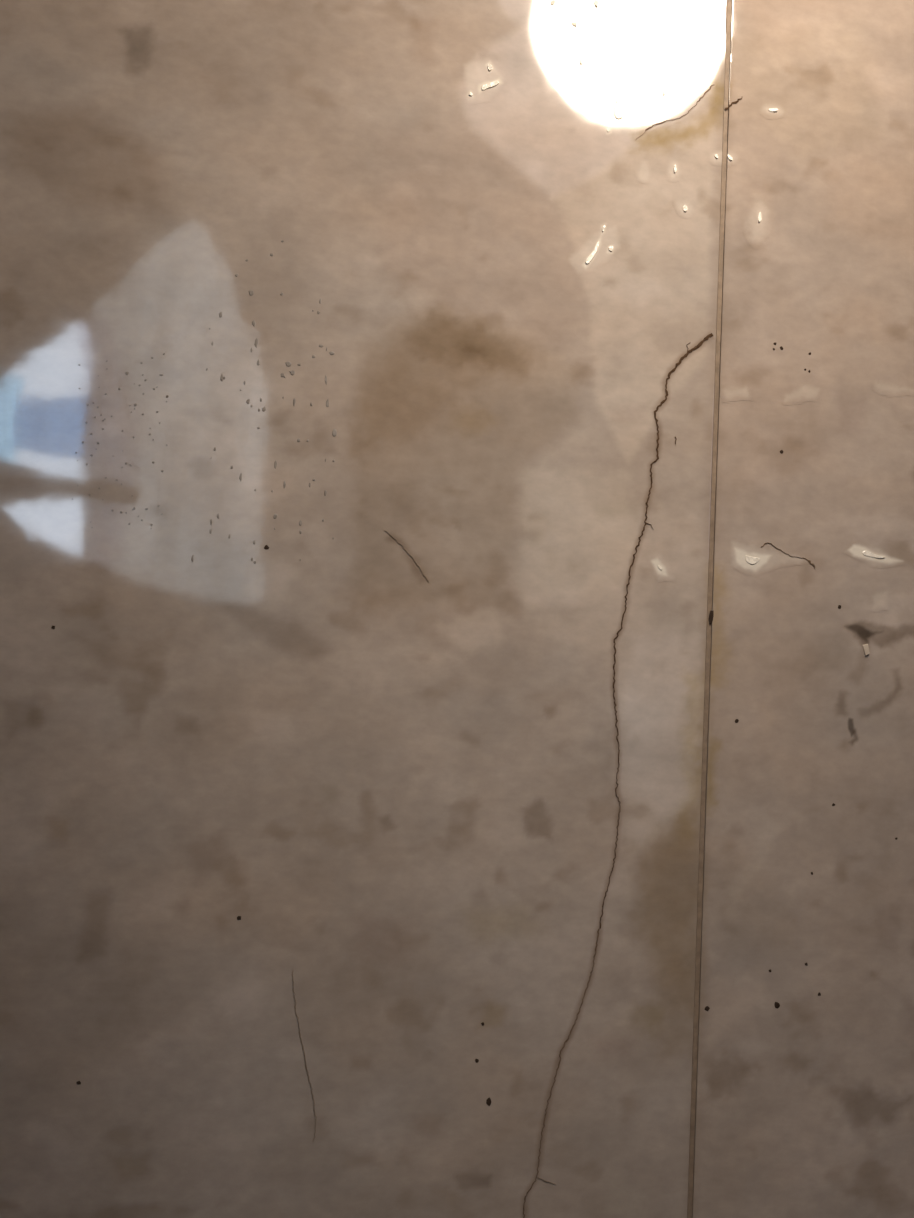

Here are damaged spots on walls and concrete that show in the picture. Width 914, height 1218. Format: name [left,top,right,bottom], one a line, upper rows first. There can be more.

crack [636,85,742,139]
leakage [340,293,544,464]
crack [517,327,716,1218]
leakage [621,795,721,1050]
leakage [697,1043,824,1114]